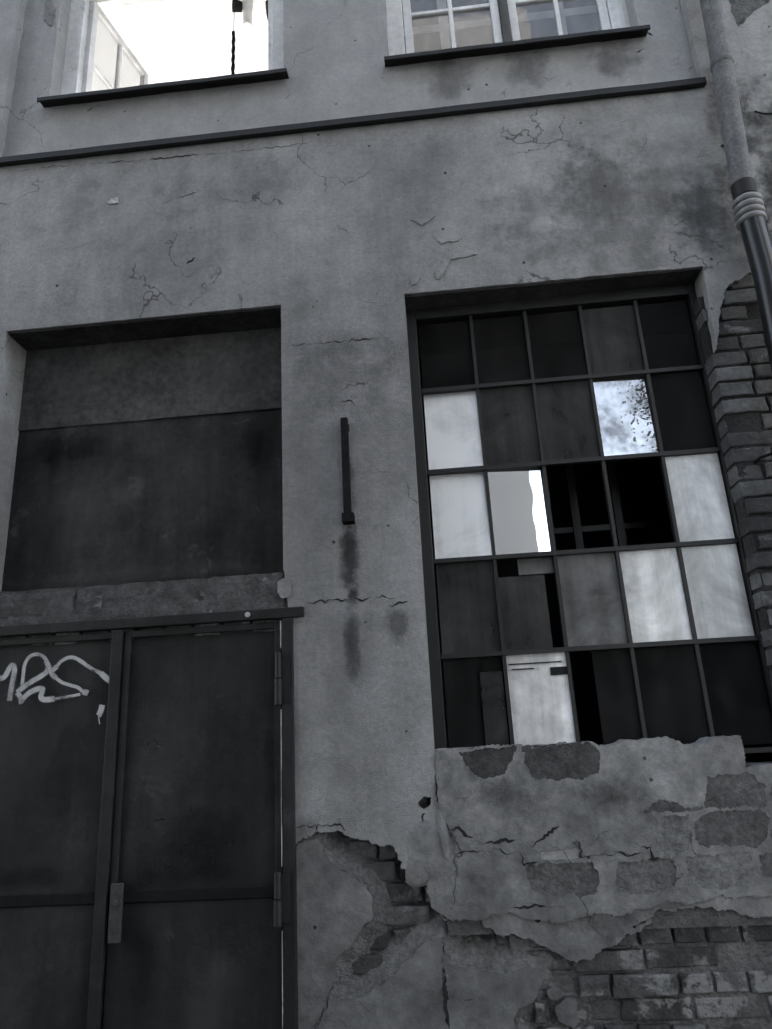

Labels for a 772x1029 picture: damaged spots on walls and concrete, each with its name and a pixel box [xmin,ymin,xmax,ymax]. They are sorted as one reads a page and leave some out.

flaking render [692,270,772,686]
flaking render [277,576,291,599]
peeling [509,661,568,675]
flaking render [459,741,600,781]
flaking render [418,796,431,808]
flaking render [615,771,772,895]
flaking render [296,830,772,1029]